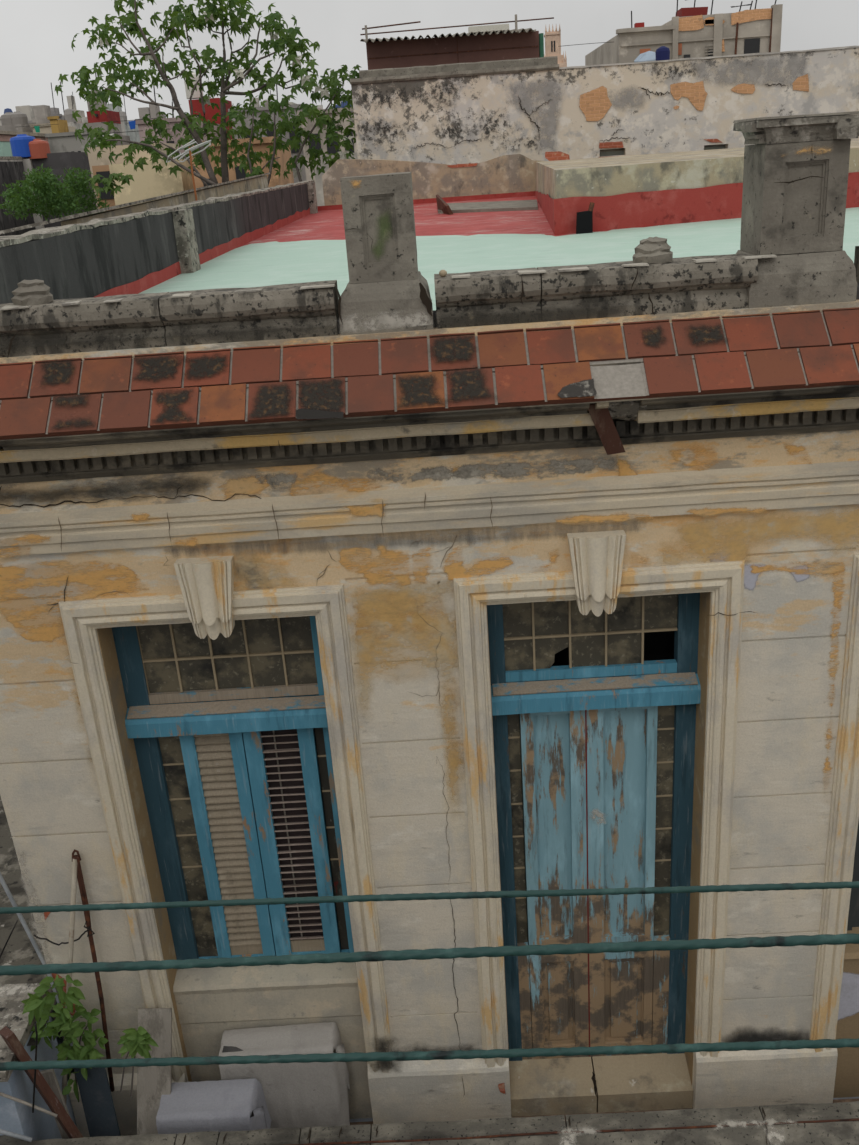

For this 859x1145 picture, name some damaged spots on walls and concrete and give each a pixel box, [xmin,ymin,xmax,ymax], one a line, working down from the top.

flaking render [679,8,772,31]
damp [358,84,455,106]
flaking render [579,86,642,121]
flaking render [670,81,707,111]
flaking render [731,84,755,94]
flaking render [792,74,809,92]
damp [358,120,401,145]
damp [435,121,466,139]
damp [481,111,536,150]
peeling [339,546,430,585]
peeling [444,549,513,580]
peeling [0,534,141,642]